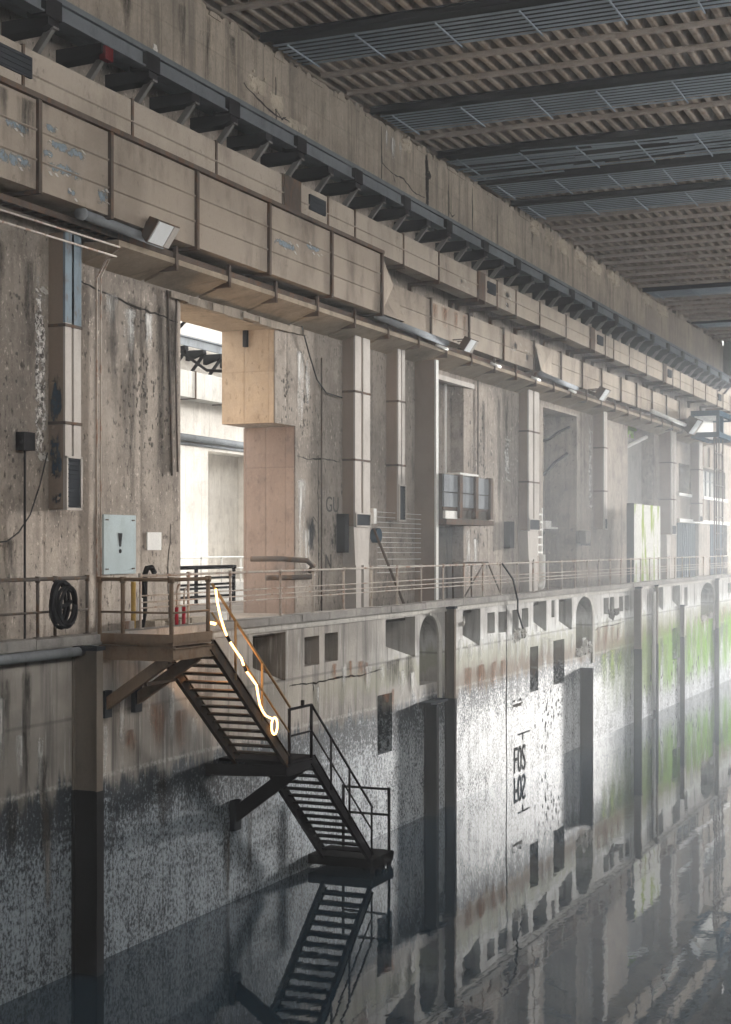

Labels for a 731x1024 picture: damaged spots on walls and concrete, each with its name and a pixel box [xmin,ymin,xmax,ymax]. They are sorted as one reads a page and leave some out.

crack [381,126,498,241]
water stain [109,296,177,436]
water stain [20,676,30,760]
crack [290,669,383,691]